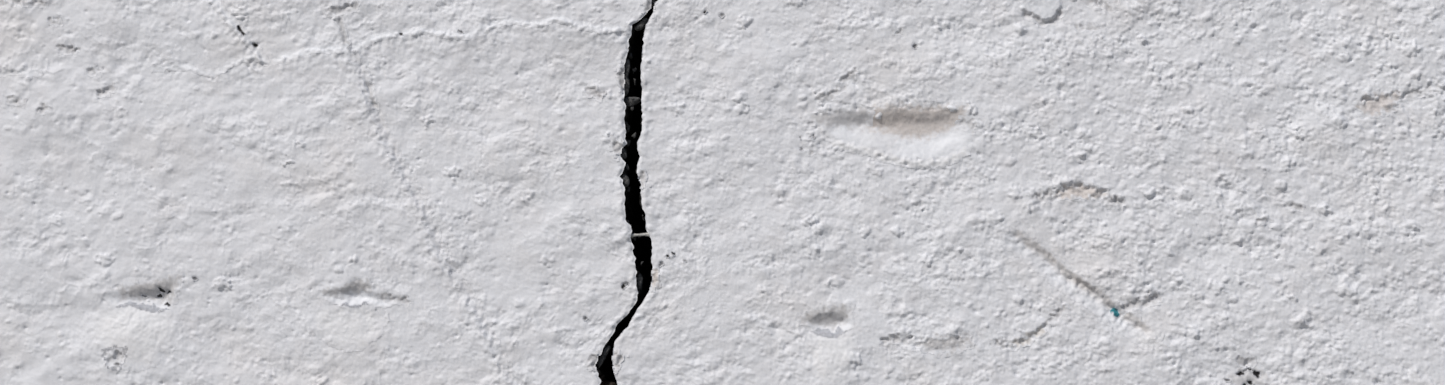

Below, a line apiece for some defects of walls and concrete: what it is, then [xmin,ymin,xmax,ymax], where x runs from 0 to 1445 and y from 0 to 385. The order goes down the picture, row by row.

crack [149,0,661,385]